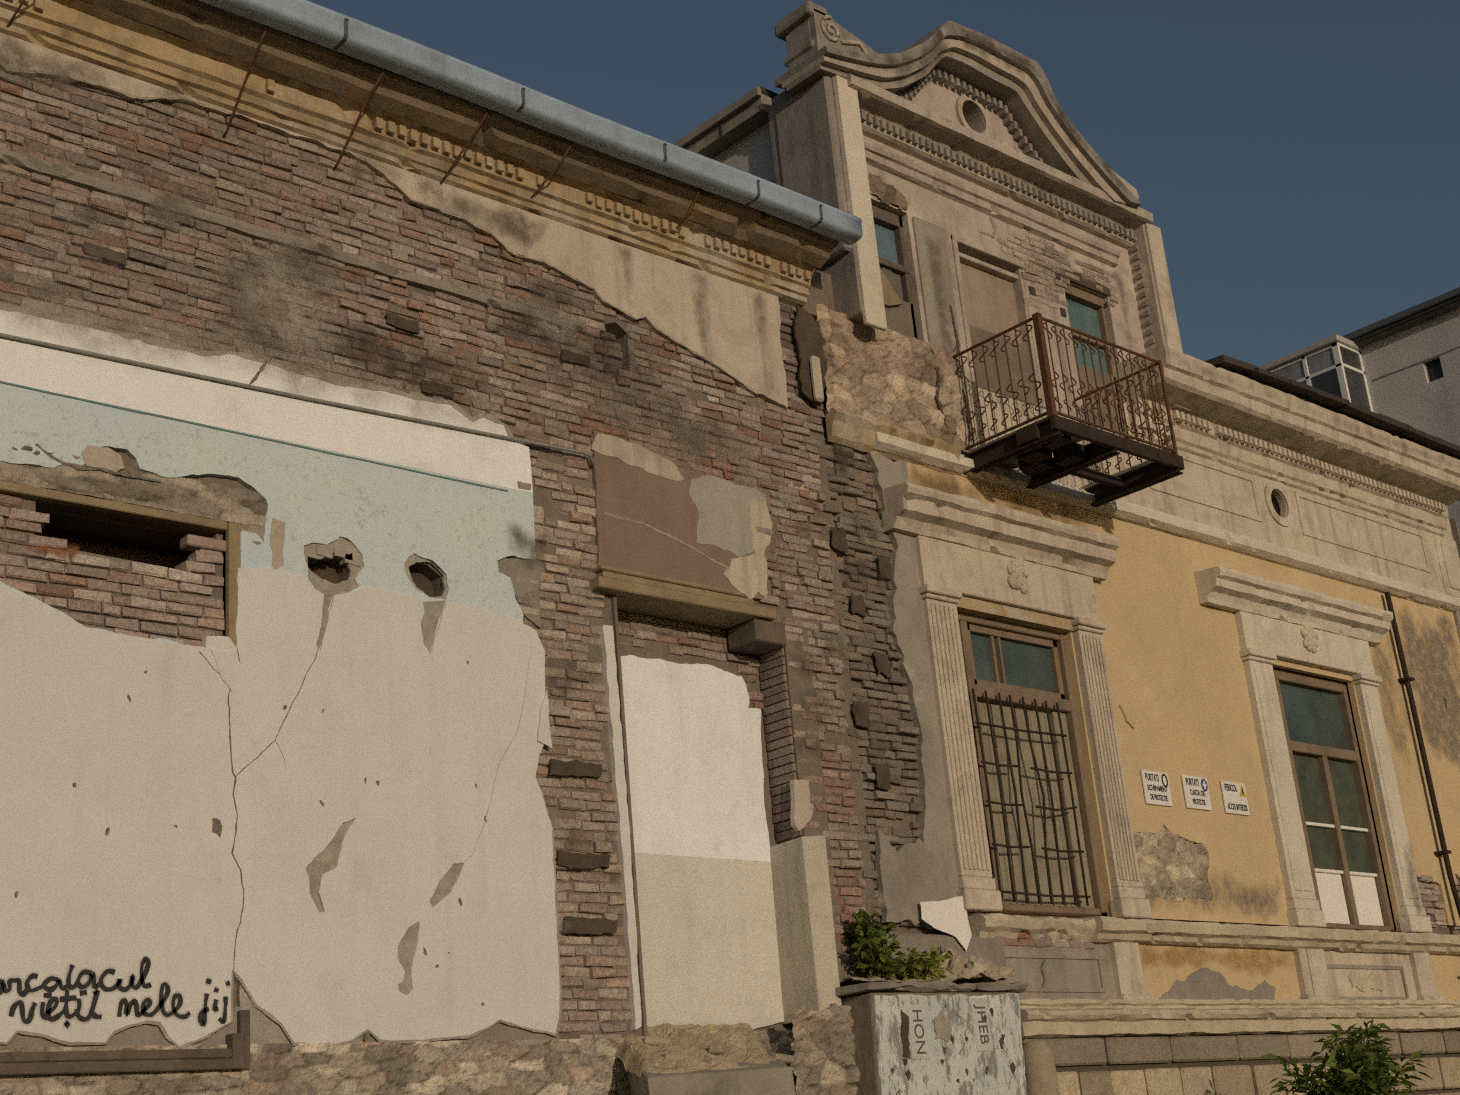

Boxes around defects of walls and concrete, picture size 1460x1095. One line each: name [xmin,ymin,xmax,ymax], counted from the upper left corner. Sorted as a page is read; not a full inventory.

water stain [455,200,530,240]
flaking render [0,63,925,1049]
water stain [1402,618,1460,759]
crack [199,646,320,971]
flaking render [1134,827,1212,902]
flaking render [1417,875,1460,930]
spalling [758,1053,794,1064]
peeling [891,1001,993,1095]